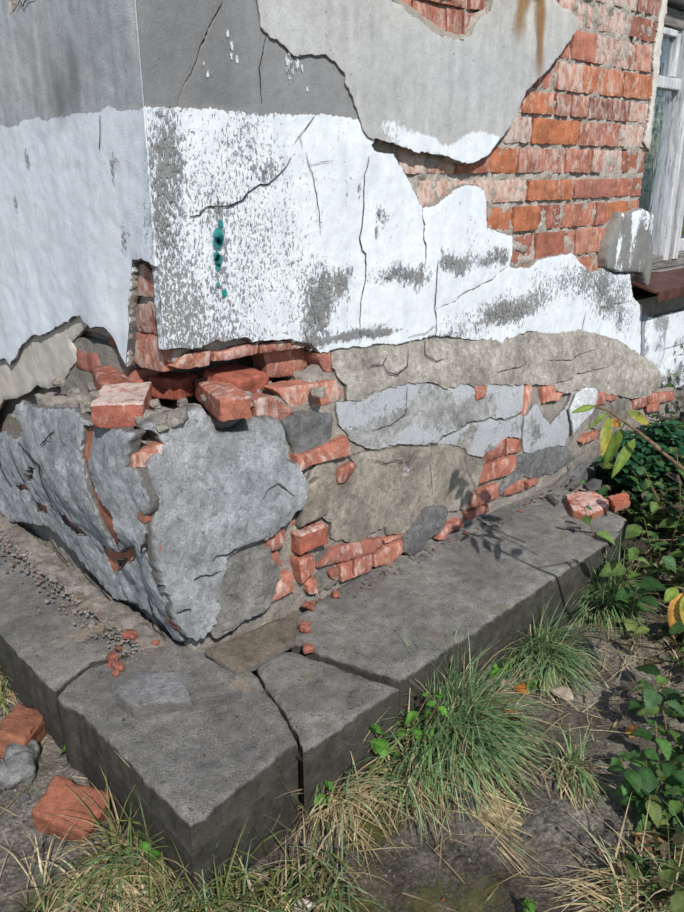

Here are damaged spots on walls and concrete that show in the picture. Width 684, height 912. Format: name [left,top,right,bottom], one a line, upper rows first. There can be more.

spalling [452,0,493,39]
corrosion [517,0,545,65]
crack [258,36,266,100]
crack [190,117,328,234]
crack [359,158,369,326]
peeling [382,247,465,293]
peeling [477,242,528,267]
flaking render [593,208,654,332]
crack [371,261,445,431]
flaking render [568,387,598,434]
spalling [81,438,136,573]
spalling [565,491,630,521]